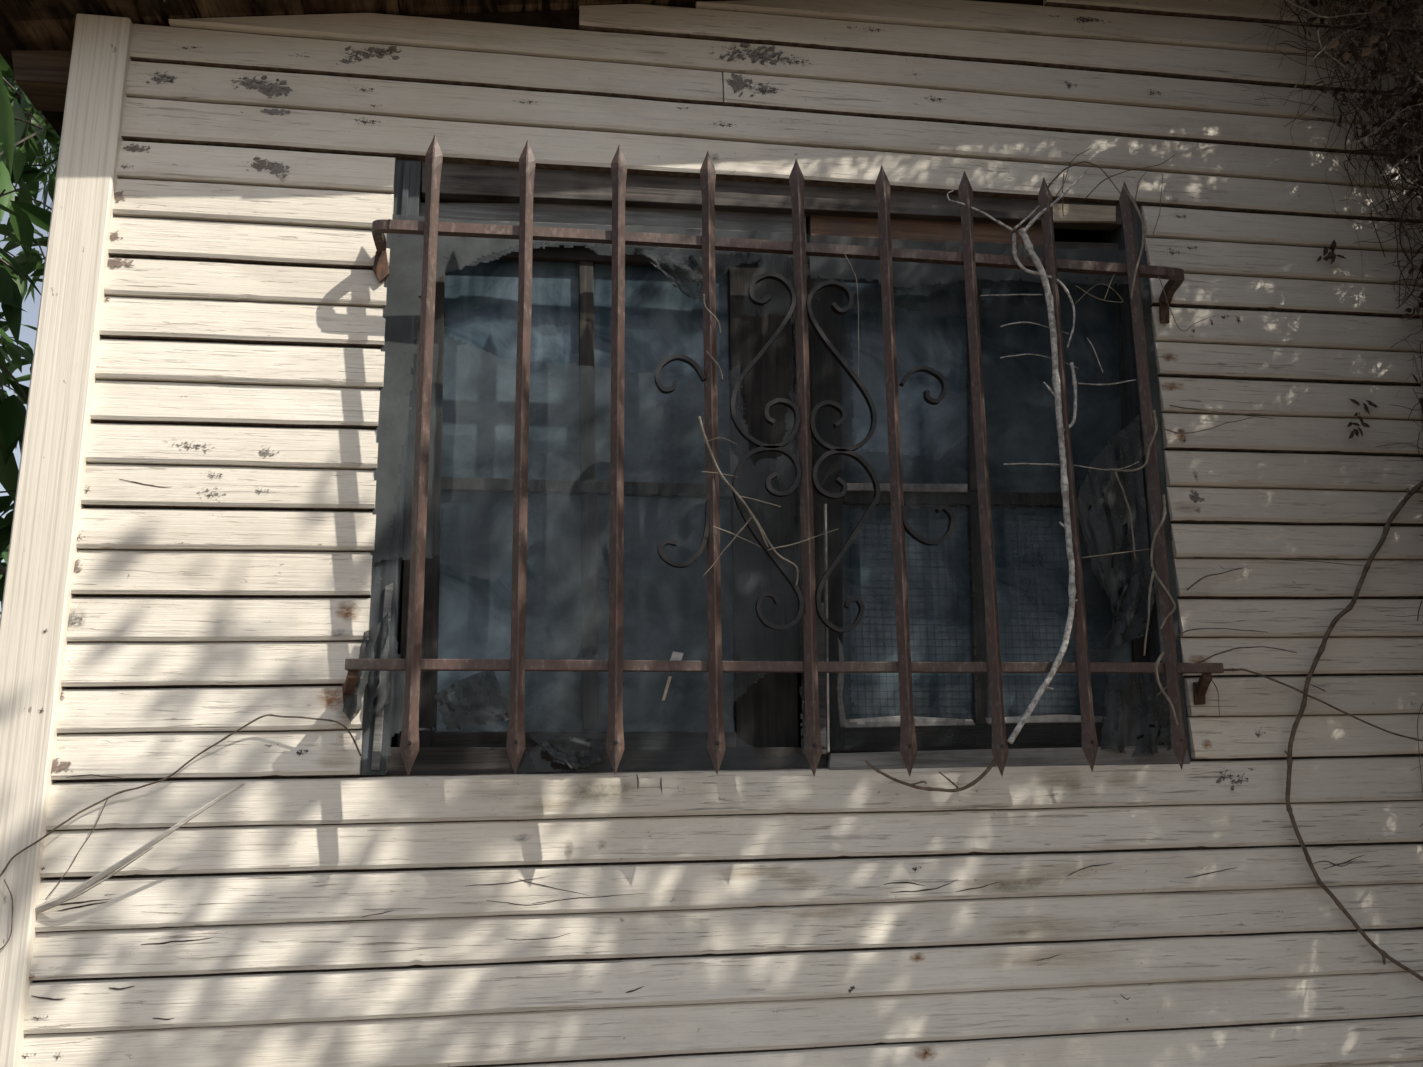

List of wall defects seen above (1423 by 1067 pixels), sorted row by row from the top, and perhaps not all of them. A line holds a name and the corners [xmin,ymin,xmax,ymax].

peeling [336,45,402,65]
peeling [712,42,813,97]
peeling [231,75,291,116]
peeling [247,157,290,181]
crack [468,876,645,940]